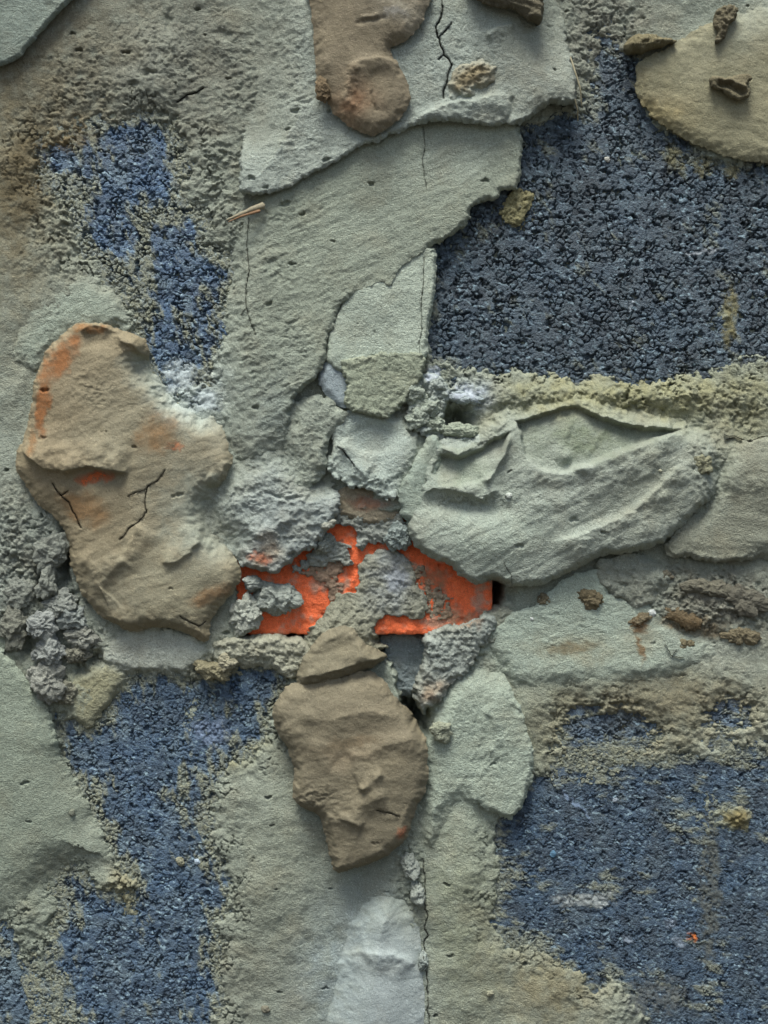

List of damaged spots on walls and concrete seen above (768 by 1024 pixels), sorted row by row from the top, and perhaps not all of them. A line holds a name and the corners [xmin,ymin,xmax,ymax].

spalling [25,96,235,404]
crack [435,6,452,97]
spalling [428,16,768,388]
spalling [0,666,290,1024]
spalling [490,693,768,1024]